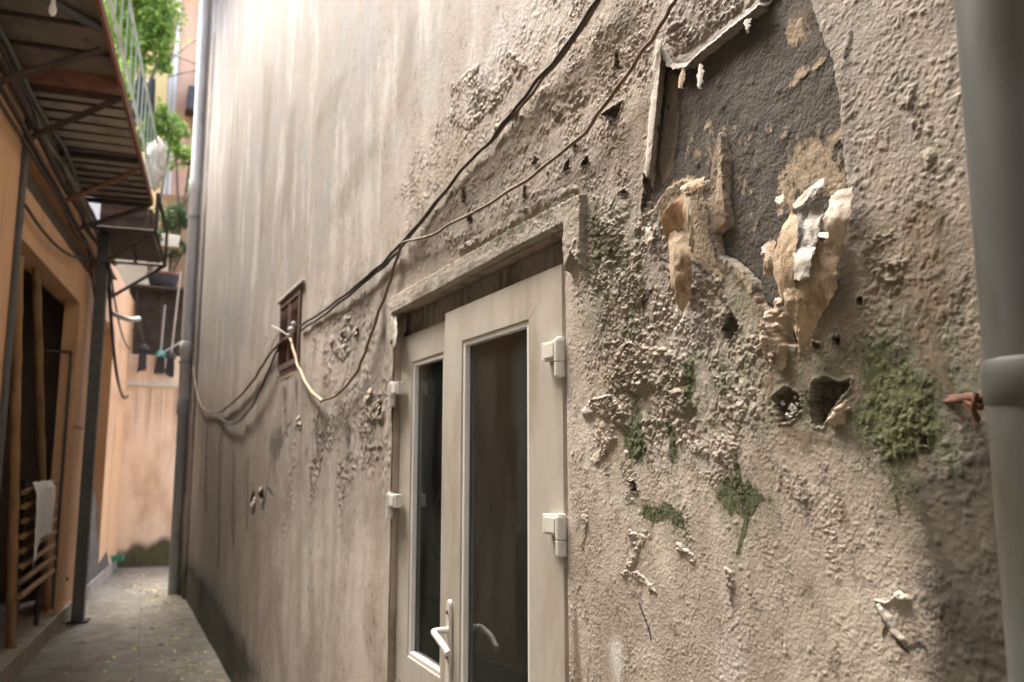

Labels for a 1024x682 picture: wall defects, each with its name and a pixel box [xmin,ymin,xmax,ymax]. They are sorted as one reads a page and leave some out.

spalling [640,0,854,371]
spalling [774,380,851,428]
peeling [250,487,265,514]
peeling [874,591,911,646]